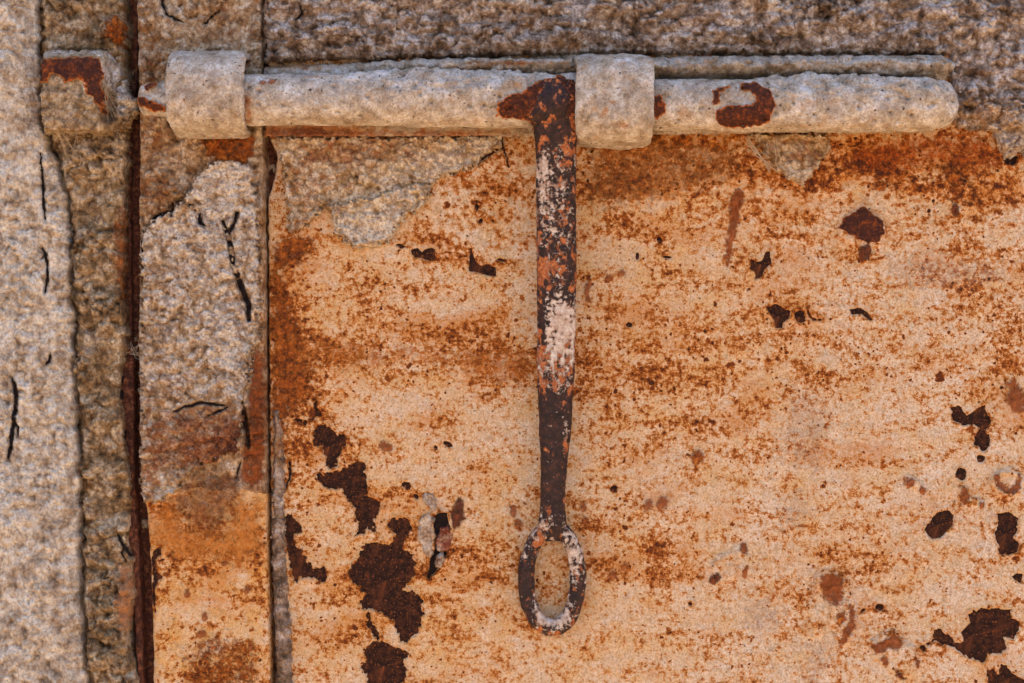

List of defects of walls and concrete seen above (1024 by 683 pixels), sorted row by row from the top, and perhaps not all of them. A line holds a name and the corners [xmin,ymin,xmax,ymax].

rust [40,56,109,115]
rust [712,81,776,129]
crack [38,153,46,219]
crack [41,247,49,293]
crack [141,203,251,322]
peeling [276,135,502,261]
rust [724,188,745,266]
rust [835,202,887,264]
crack [7,378,19,459]
crack [173,401,250,478]
rust [804,567,859,647]
rust [868,627,922,682]